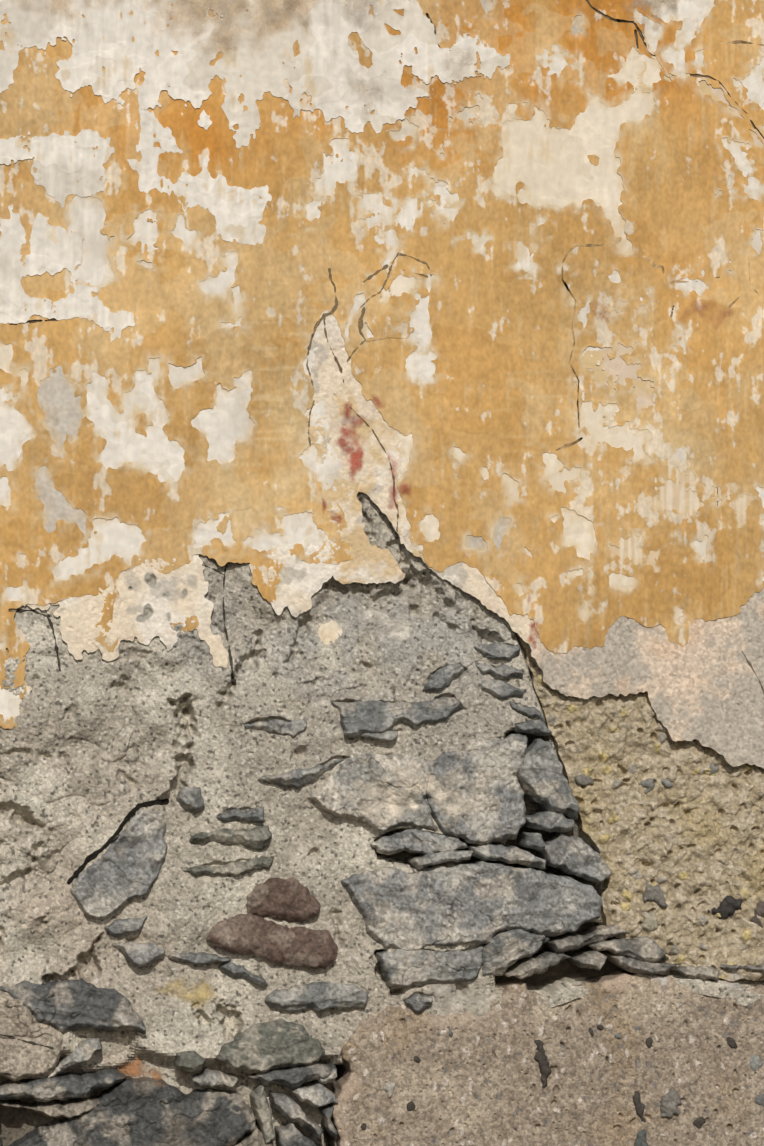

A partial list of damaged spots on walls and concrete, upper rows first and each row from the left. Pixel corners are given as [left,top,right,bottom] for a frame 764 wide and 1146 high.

crack [585,0,655,56]
crack [720,39,764,47]
peeling [490,0,764,254]
crack [690,74,764,139]
peeling [0,0,510,386]
peeling [513,241,538,279]
peeling [674,269,709,296]
crack [728,256,760,308]
crack [556,240,720,451]
crack [306,252,432,535]
flaking render [0,288,764,982]
spalling [404,993,433,1013]